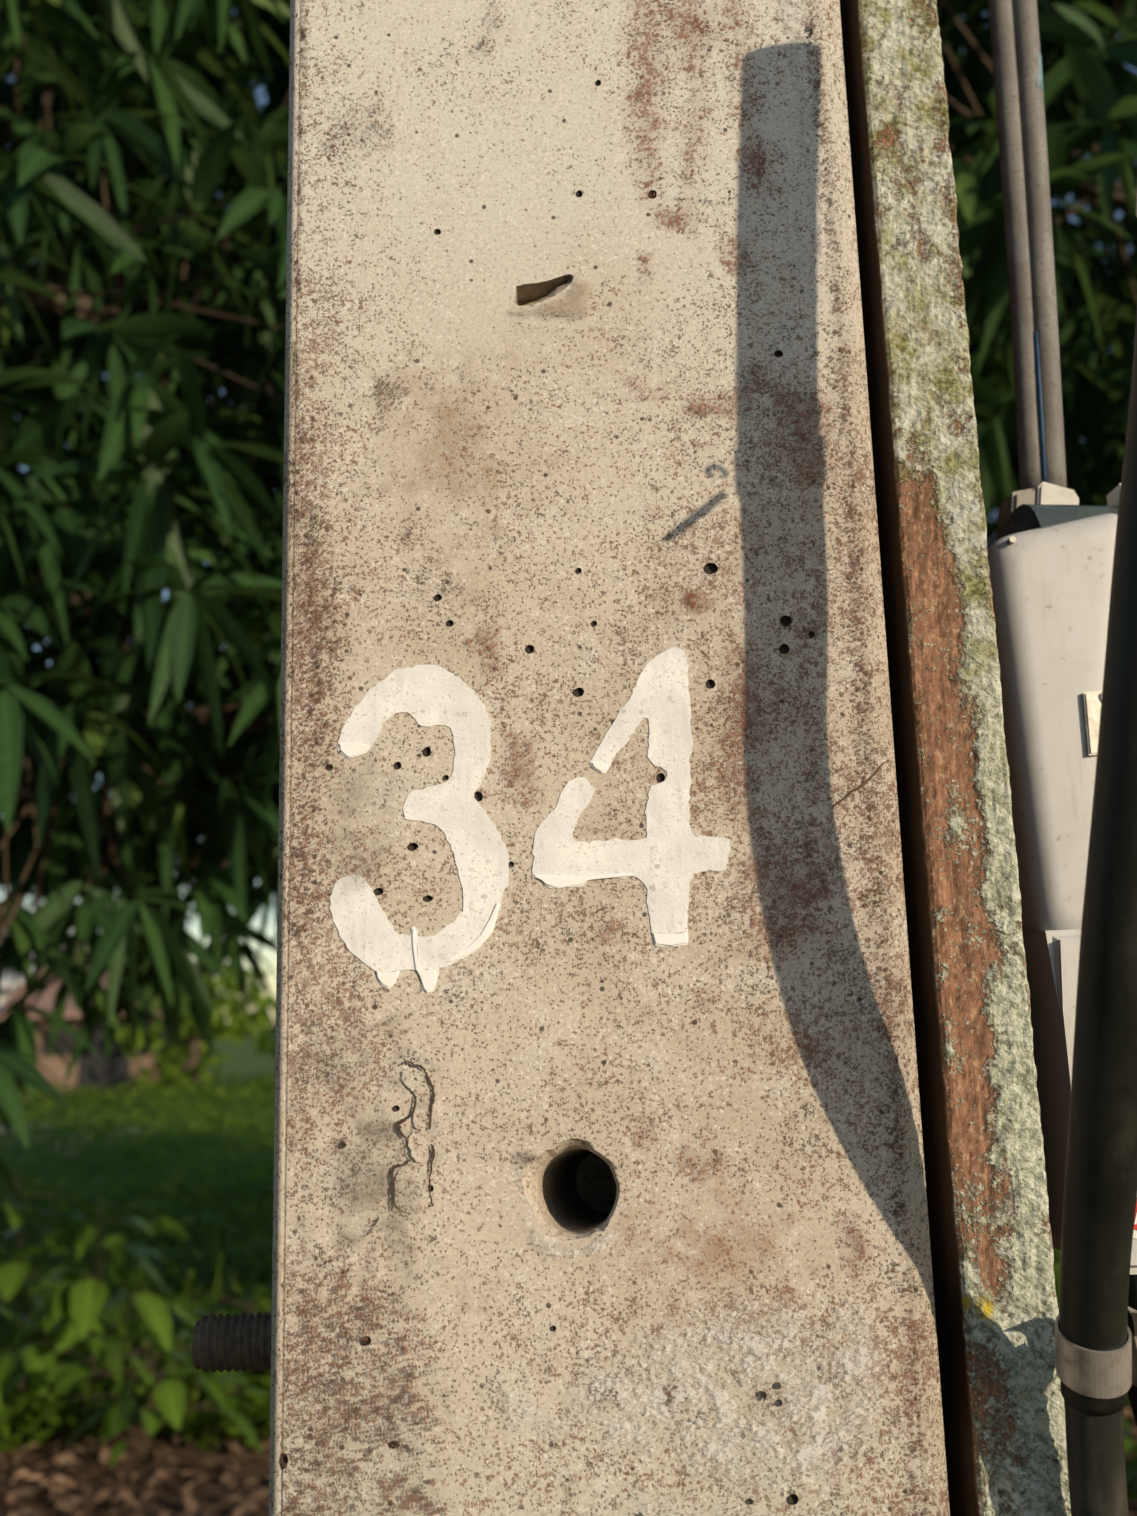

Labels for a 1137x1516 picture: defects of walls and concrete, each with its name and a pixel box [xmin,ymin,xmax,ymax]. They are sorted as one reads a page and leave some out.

crack [366,1061,436,1236]
corrosion [613,0,930,1516]